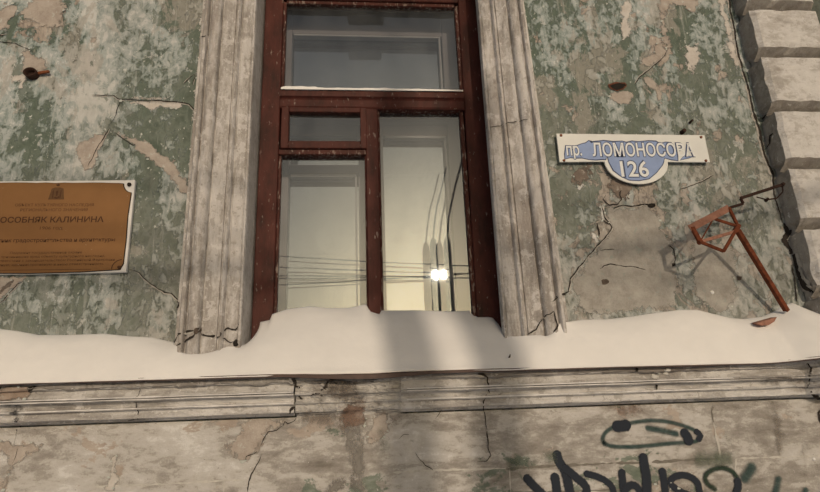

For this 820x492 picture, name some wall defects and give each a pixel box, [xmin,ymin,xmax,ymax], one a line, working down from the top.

peeling [0,0,67,31]
peeling [11,49,48,89]
peeling [119,96,182,112]
peeling [74,131,107,170]
peeling [117,131,188,193]